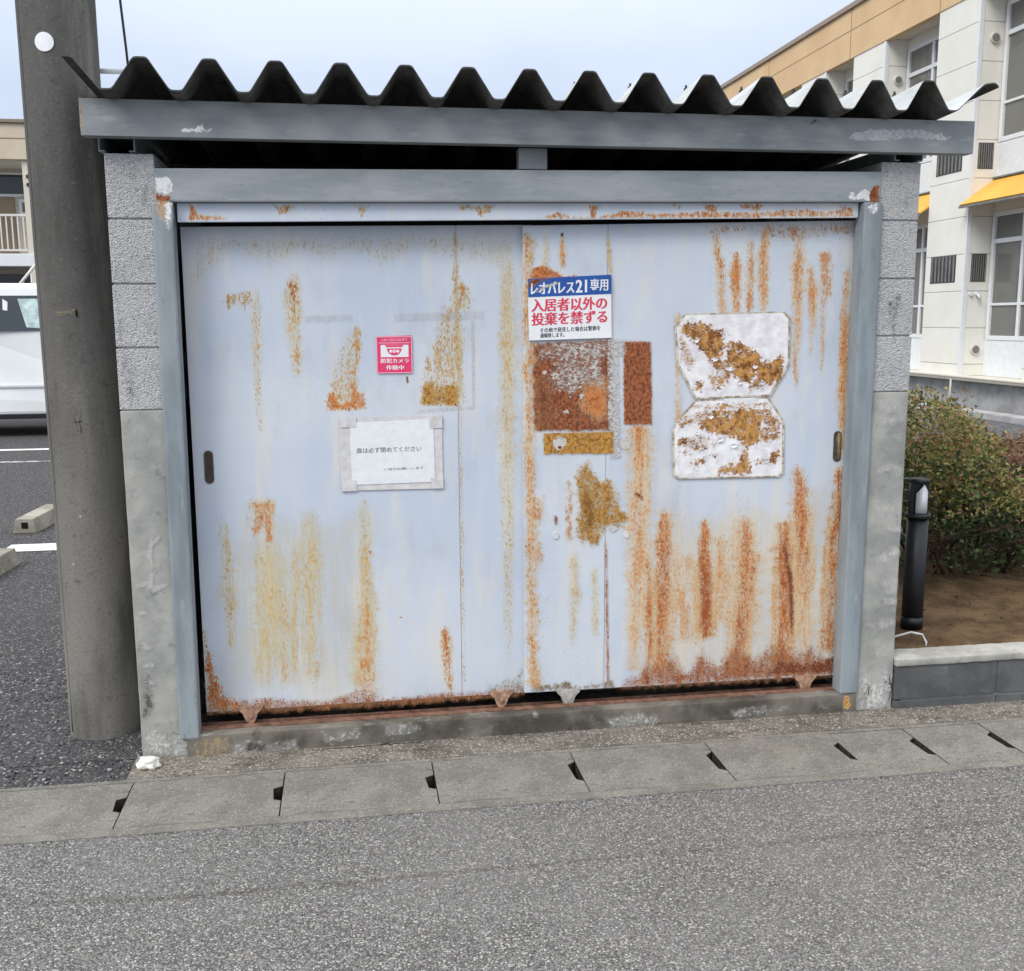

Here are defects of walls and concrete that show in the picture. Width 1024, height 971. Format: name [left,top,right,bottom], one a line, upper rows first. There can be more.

peeling [155,176,173,230]
corrosion [188,204,222,221]
corrosion [197,203,855,715]